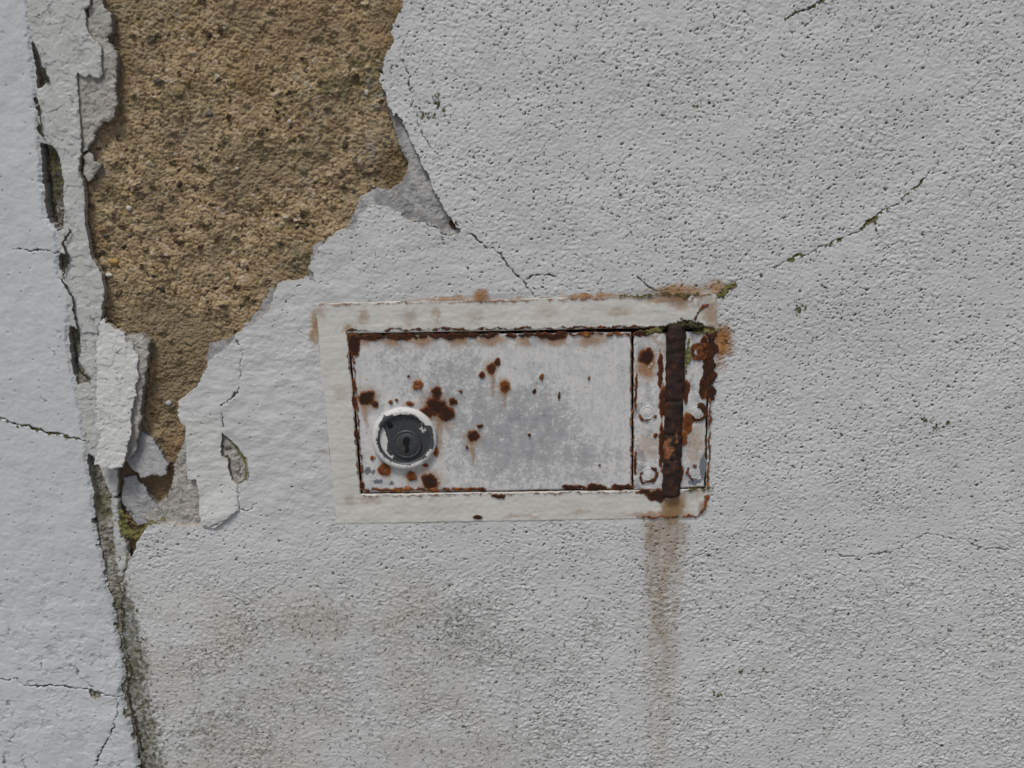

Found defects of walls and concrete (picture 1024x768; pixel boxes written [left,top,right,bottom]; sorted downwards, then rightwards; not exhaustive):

crack [0,0,158,768]
spalling [78,0,461,556]
crack [419,221,555,294]
rust [659,281,726,294]
rust [714,327,731,357]
crack [760,161,940,276]